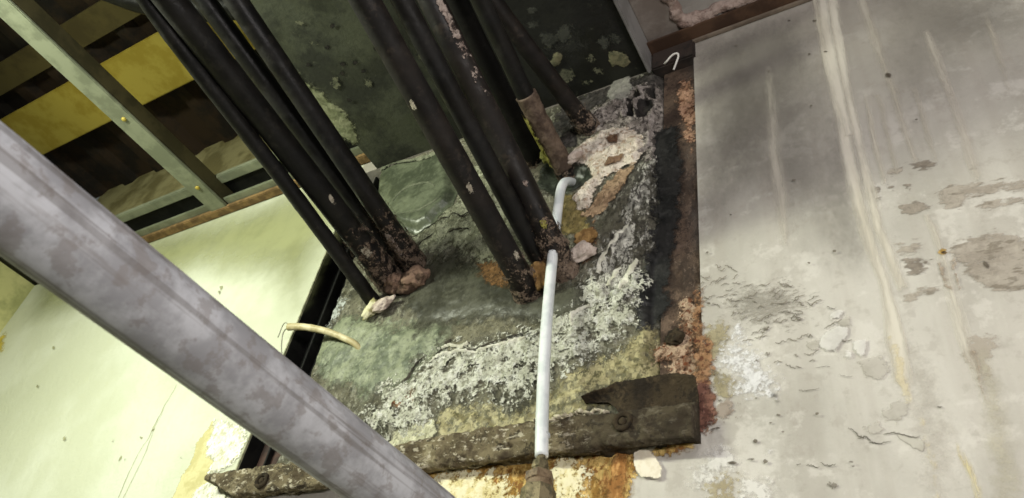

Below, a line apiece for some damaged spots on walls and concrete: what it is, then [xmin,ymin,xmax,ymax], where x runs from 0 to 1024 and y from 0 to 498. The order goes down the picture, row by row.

flaking render [572,82,664,218]
damp [353,155,660,441]
rust [649,79,734,435]
damp [705,323,780,400]
peeling [697,265,890,380]
rust [428,463,532,498]
rust [547,454,638,498]
rust [651,443,694,457]